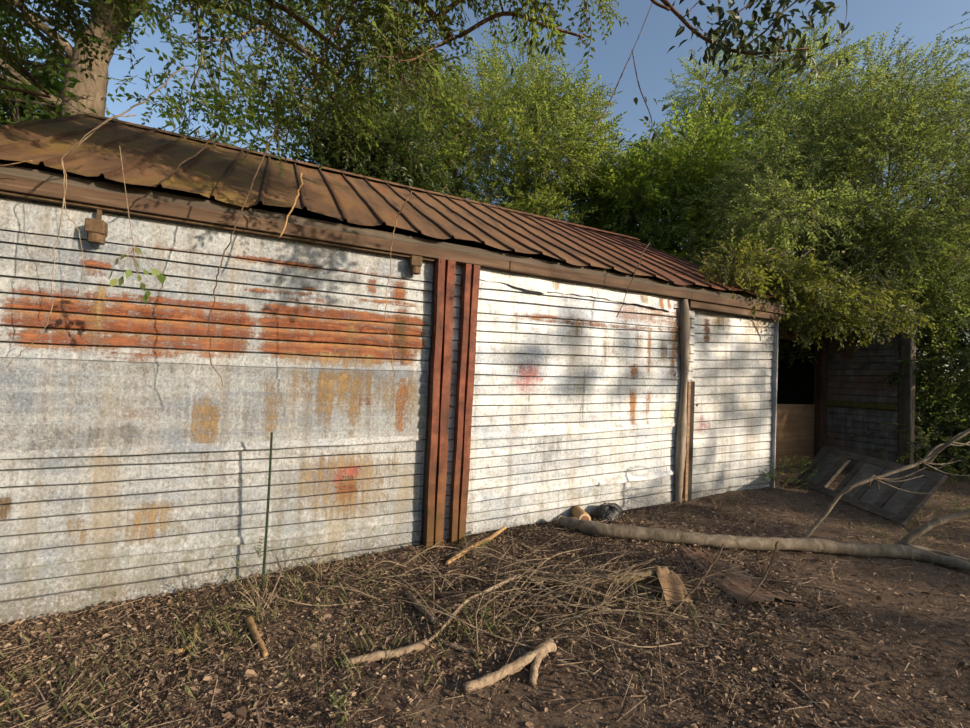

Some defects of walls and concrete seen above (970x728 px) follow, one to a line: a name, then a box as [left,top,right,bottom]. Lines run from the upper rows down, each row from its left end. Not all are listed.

corrosion [237,256,322,270]
corrosion [2,259,427,435]
corrosion [192,401,219,444]
corrosion [299,454,385,518]